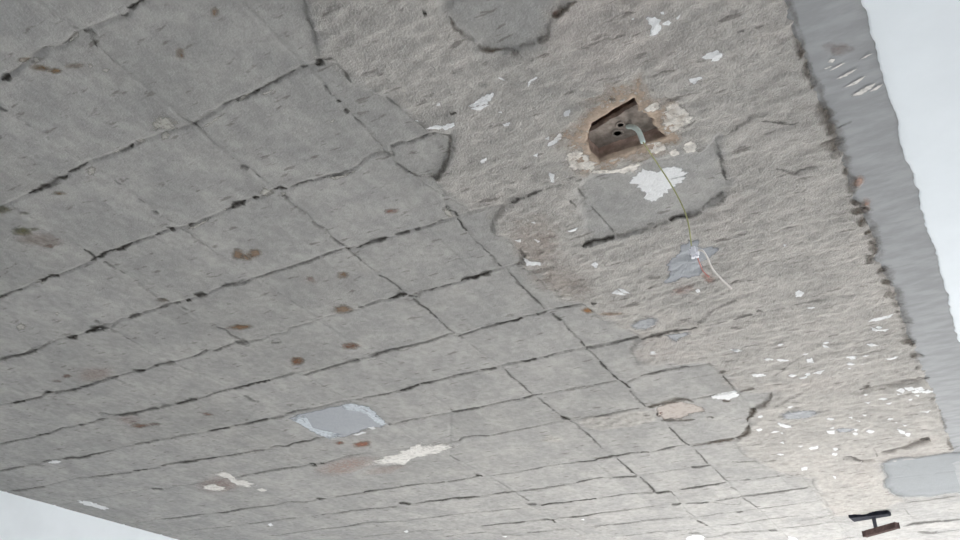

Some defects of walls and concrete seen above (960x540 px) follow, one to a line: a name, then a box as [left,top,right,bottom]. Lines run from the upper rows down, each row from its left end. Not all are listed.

spalling [545,81,679,172]
crack [29,162,88,194]
crack [231,180,312,208]
peeling [629,166,688,202]
crack [84,242,133,262]
rust [233,250,260,260]
crack [348,228,420,260]
crack [582,235,614,247]
crack [68,326,106,339]
crack [400,249,772,526]
peeling [711,390,739,400]
spalling [657,402,704,420]